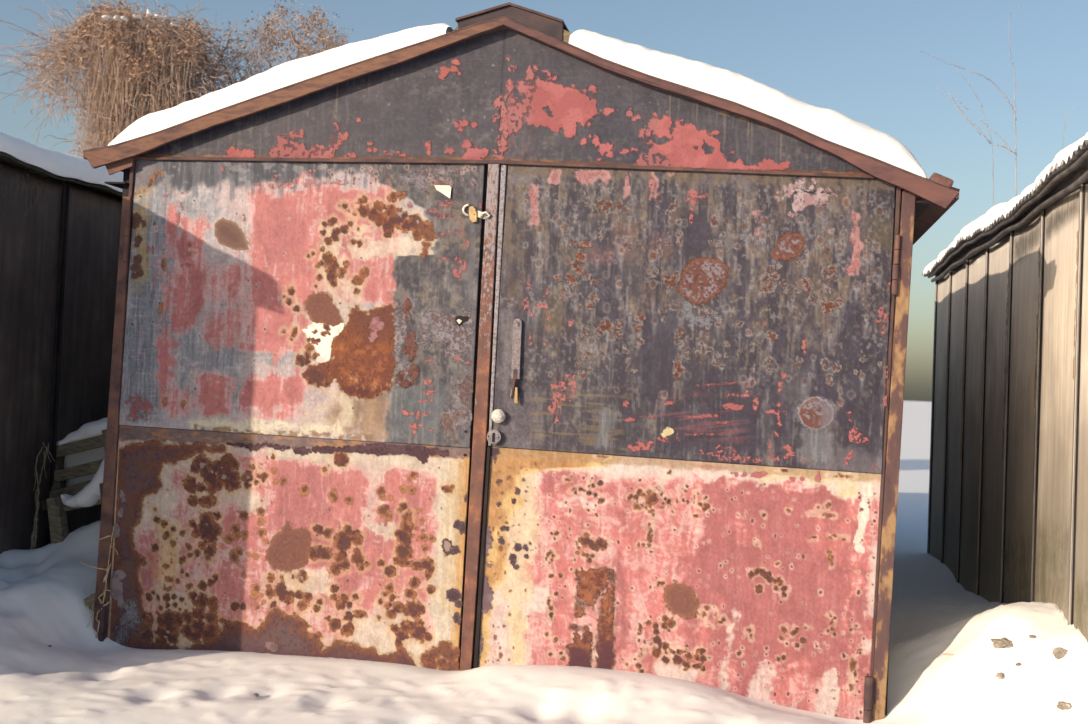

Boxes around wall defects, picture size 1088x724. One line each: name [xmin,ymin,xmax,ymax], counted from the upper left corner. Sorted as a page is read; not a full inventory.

peeling [439,59,461,80]
peeling [444,57,791,184]
peeling [221,146,255,172]
peeling [253,122,406,189]
peeling [775,177,835,218]
corrosion [282,191,436,399]
peeling [302,322,345,363]
corrosion [627,487,710,547]
corrosion [110,440,466,671]
corrosion [497,525,529,570]
corrosion [545,531,706,673]
corrosion [748,563,787,597]